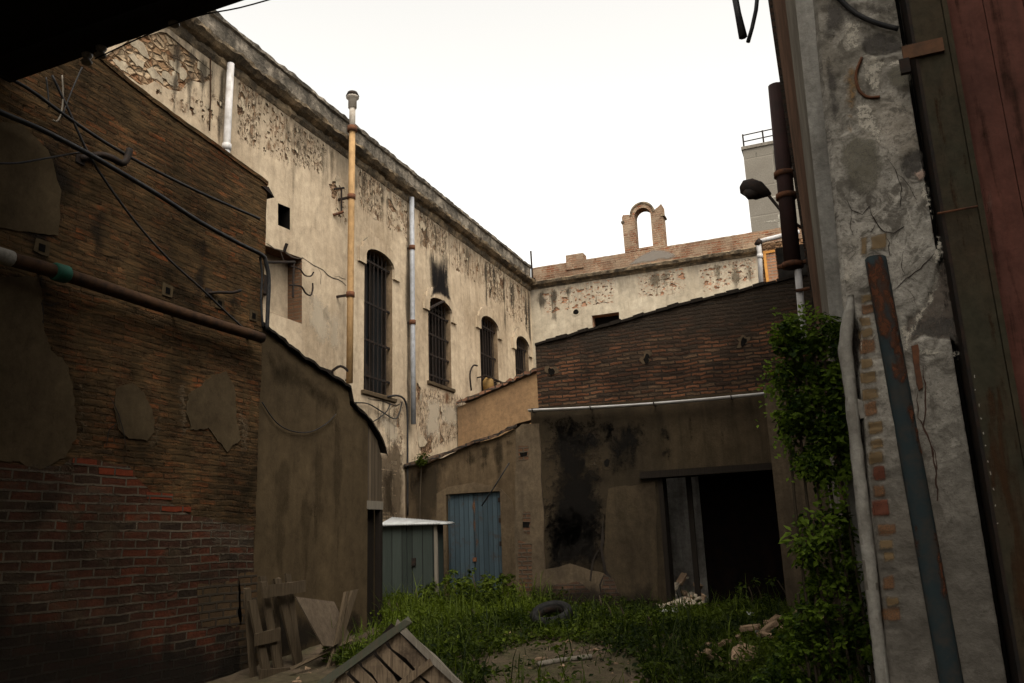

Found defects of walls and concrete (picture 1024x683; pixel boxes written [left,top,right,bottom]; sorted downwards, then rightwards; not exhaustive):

flaking render [106,32,222,124]
flaking render [237,81,326,172]
crack [847,162,934,304]
flaking render [543,280,615,313]
rust [868,255,907,383]
flaking render [113,383,155,441]
flaking render [852,294,896,561]